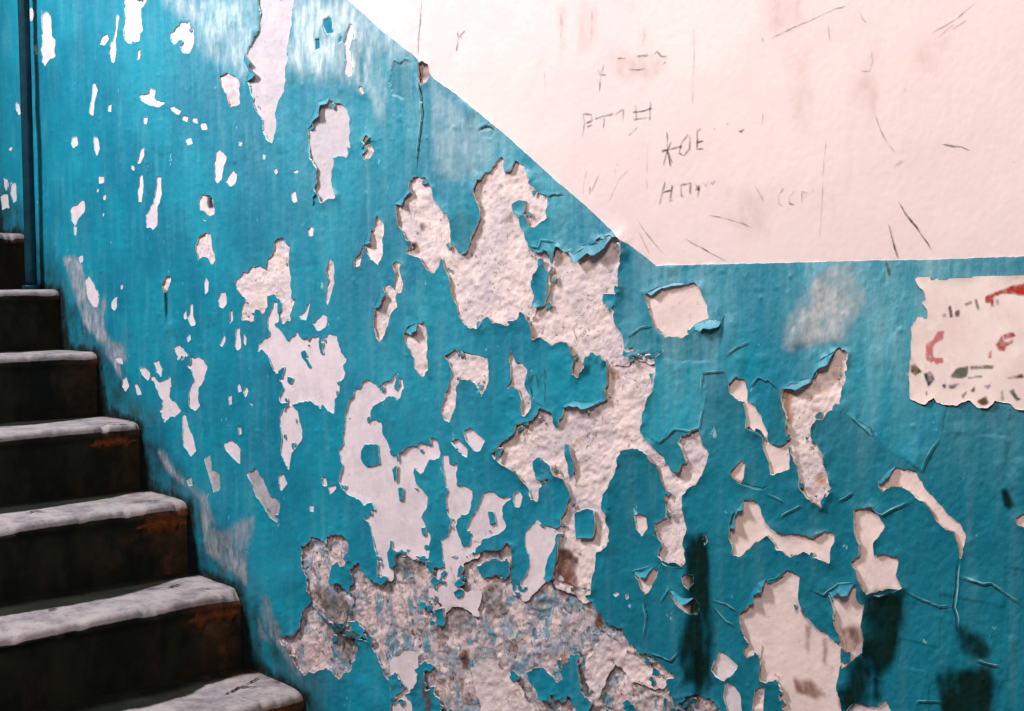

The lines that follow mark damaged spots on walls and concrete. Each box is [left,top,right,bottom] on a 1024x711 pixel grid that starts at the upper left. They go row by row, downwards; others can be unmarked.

peeling [30,7,55,66]
peeling [100,0,146,63]
peeling [219,0,294,143]
crack [376,13,424,172]
peeling [131,148,162,230]
peeling [195,194,215,264]
peeling [214,150,237,186]
peeling [307,97,374,205]
peeling [122,303,220,492]
spalling [204,157,902,711]
peeling [878,466,966,559]
crack [908,560,1020,633]